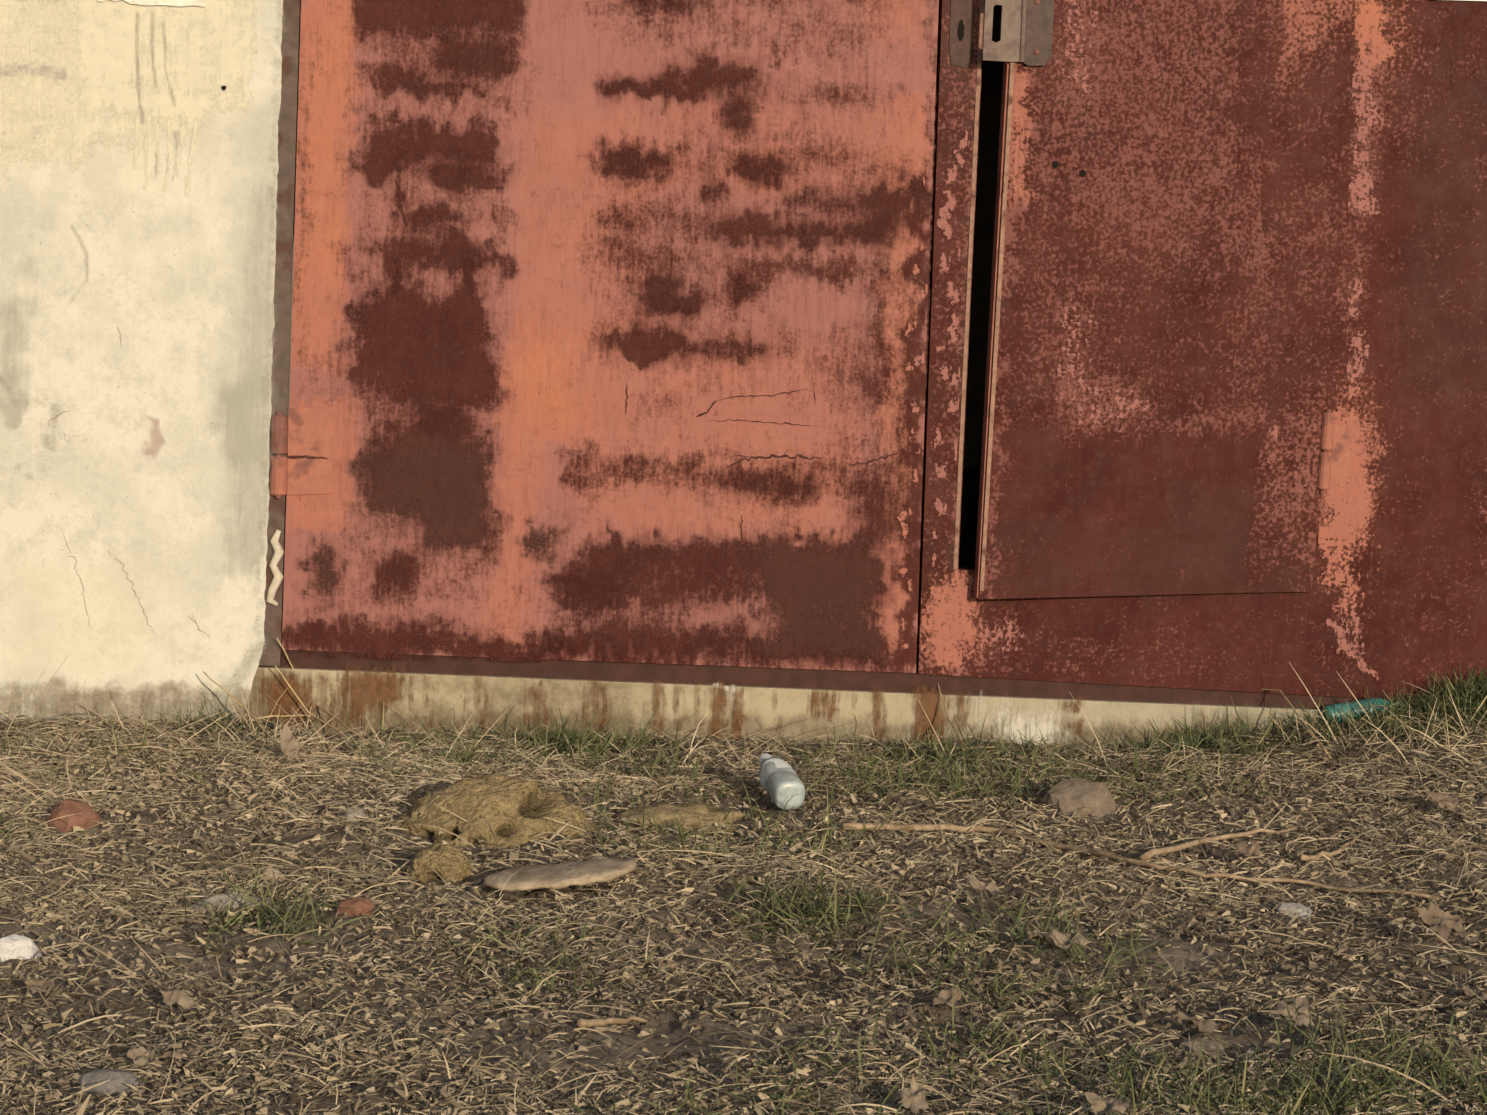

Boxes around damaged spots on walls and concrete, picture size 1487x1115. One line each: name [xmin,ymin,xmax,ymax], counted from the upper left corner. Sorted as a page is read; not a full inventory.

crack [60,528,153,631]
corrosion [262,667,428,731]
corrosion [653,682,679,732]
corrosion [698,684,743,740]
corrosion [810,691,836,719]
corrosion [874,691,885,742]
corrosion [912,688,968,742]
corrosion [1065,699,1082,732]